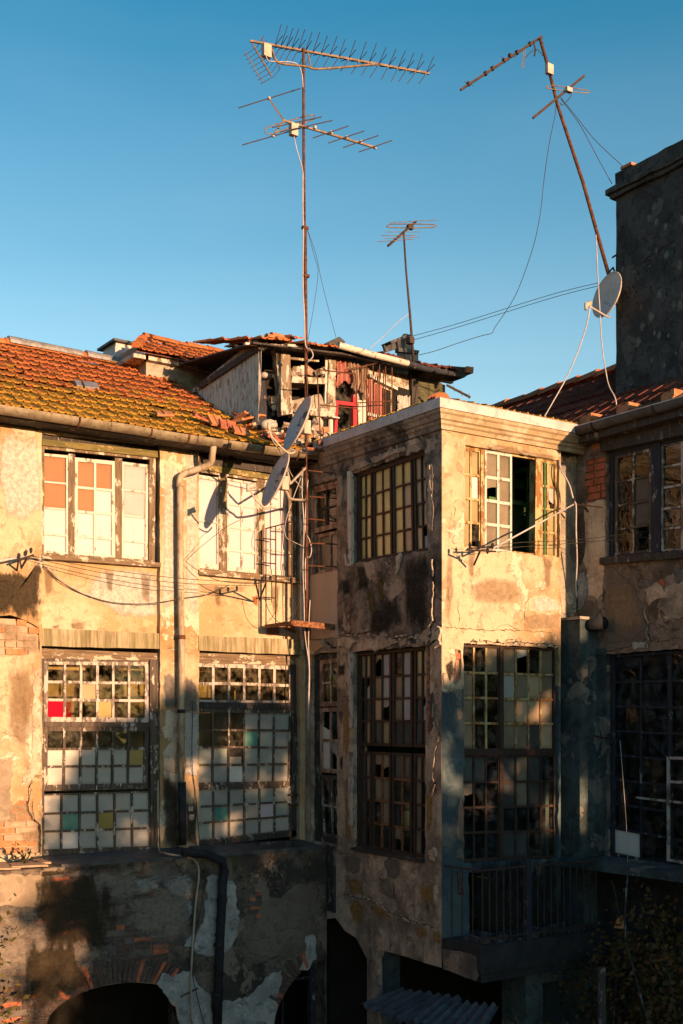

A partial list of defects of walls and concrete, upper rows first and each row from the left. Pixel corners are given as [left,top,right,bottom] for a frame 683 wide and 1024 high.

flaking render [11,427,36,443]
flaking render [566,443,609,617]
flaking render [0,618,39,657]
water stain [342,555,428,632]
flaking render [644,579,683,620]
crack [431,701,440,796]
flaking render [0,668,262,1024]
water stain [42,867,193,947]
water stain [0,906,106,1007]
flaking render [299,935,317,971]
flaking render [157,970,282,1024]